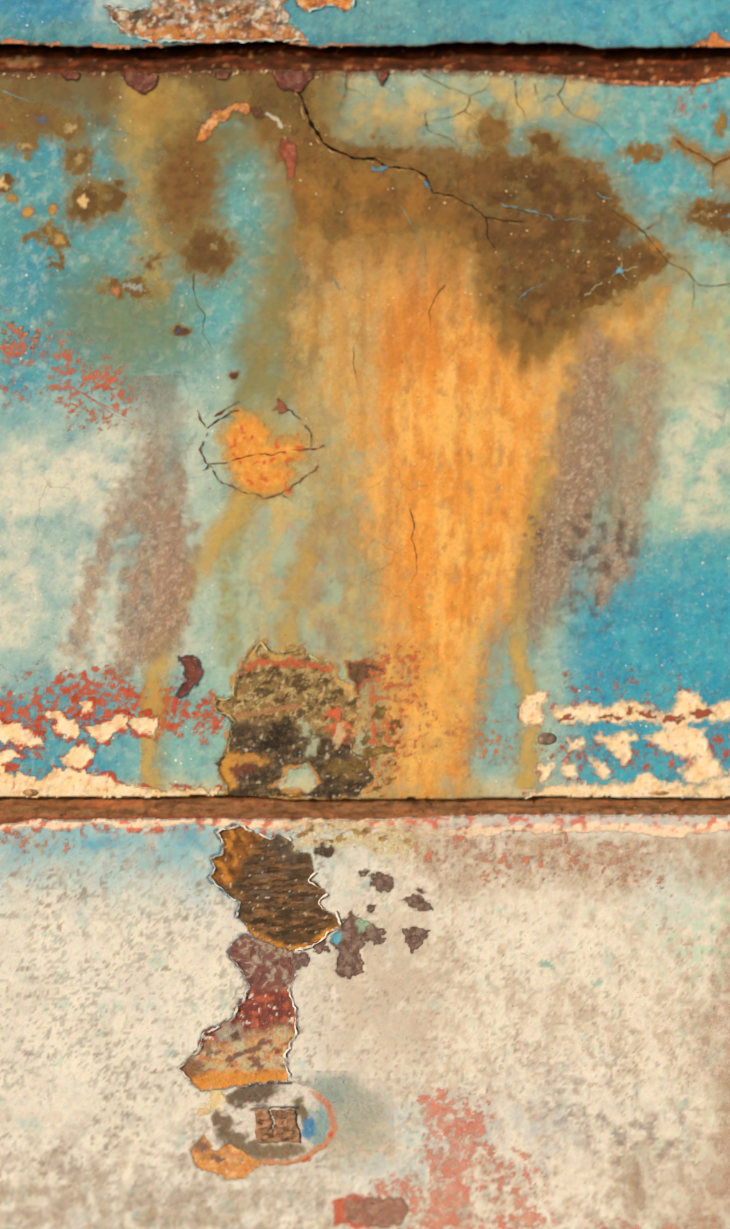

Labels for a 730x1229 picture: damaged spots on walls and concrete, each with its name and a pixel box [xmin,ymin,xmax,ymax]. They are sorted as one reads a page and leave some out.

peeling [104,0,355,44]
crack [295,74,627,247]
crack [669,135,730,186]
crack [610,209,730,301]
crack [197,398,325,502]
rust [0,69,687,798]
peeling [0,639,437,799]
peeling [436,664,730,799]
peeling [0,814,730,1180]